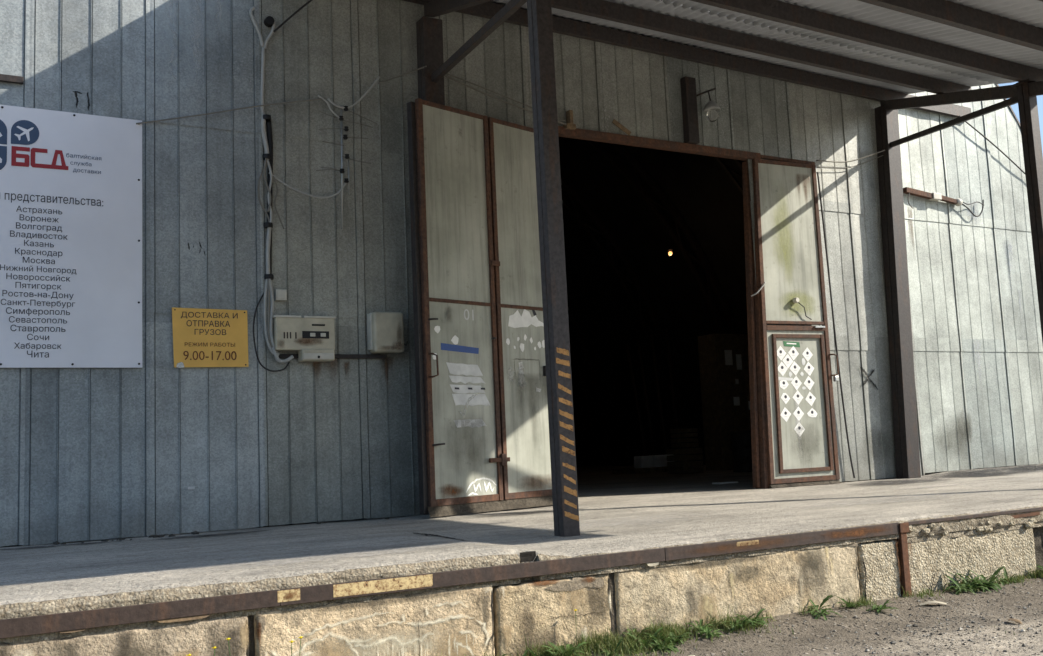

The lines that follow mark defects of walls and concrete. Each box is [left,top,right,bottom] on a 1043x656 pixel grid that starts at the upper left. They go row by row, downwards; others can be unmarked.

crack [855,548,869,601]